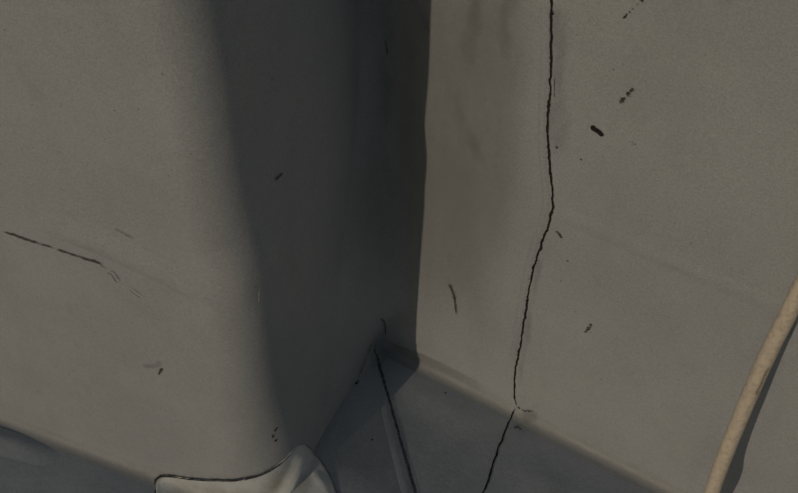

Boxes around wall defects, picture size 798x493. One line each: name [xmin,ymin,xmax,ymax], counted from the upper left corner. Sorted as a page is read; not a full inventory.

crack [5,232,139,297]
crack [482,0,555,493]
crack [374,349,416,493]